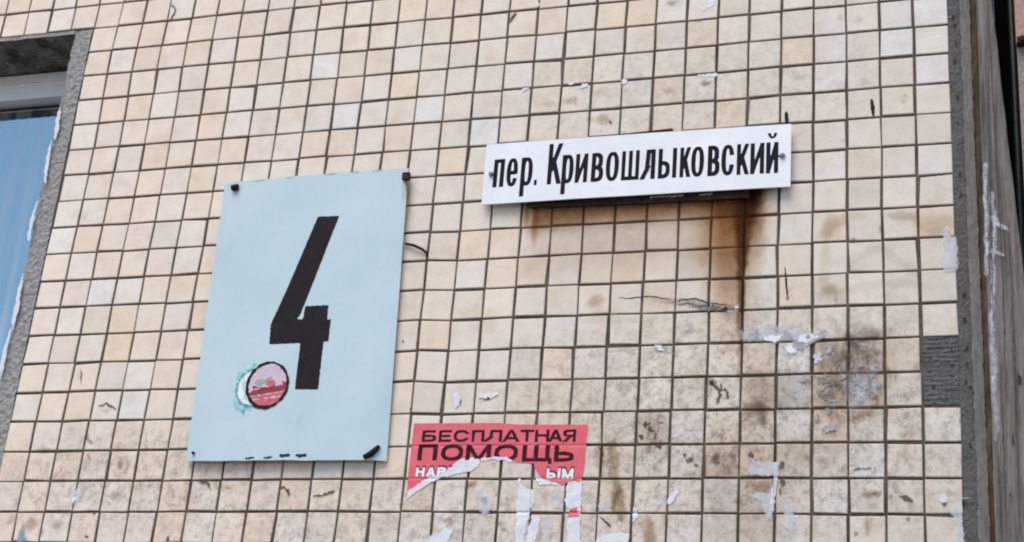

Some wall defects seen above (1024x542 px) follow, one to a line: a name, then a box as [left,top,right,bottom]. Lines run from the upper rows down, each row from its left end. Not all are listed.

corrosion [736,189,760,308]
spalling [923,337,971,405]